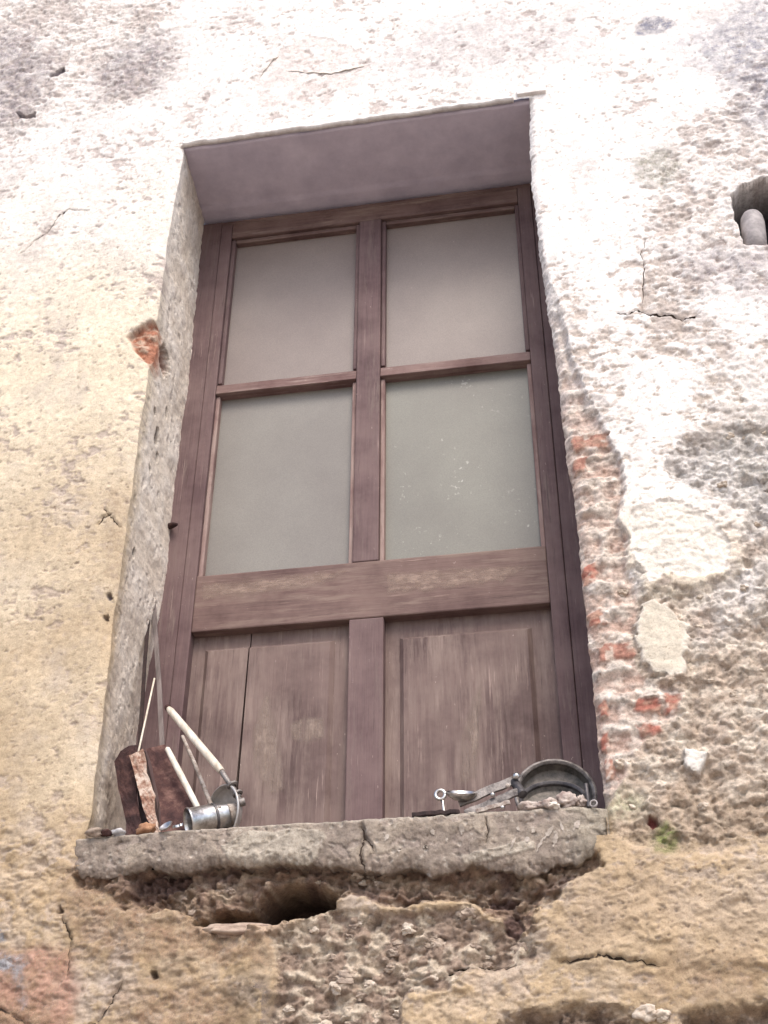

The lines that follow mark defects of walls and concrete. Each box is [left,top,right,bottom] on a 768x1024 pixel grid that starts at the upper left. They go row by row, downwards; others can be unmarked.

crack [617,243,695,322]
spalling [129,320,171,378]
spalling [538,230,768,854]
crack [359,827,374,869]
spalling [67,827,605,1024]
crack [562,953,660,967]